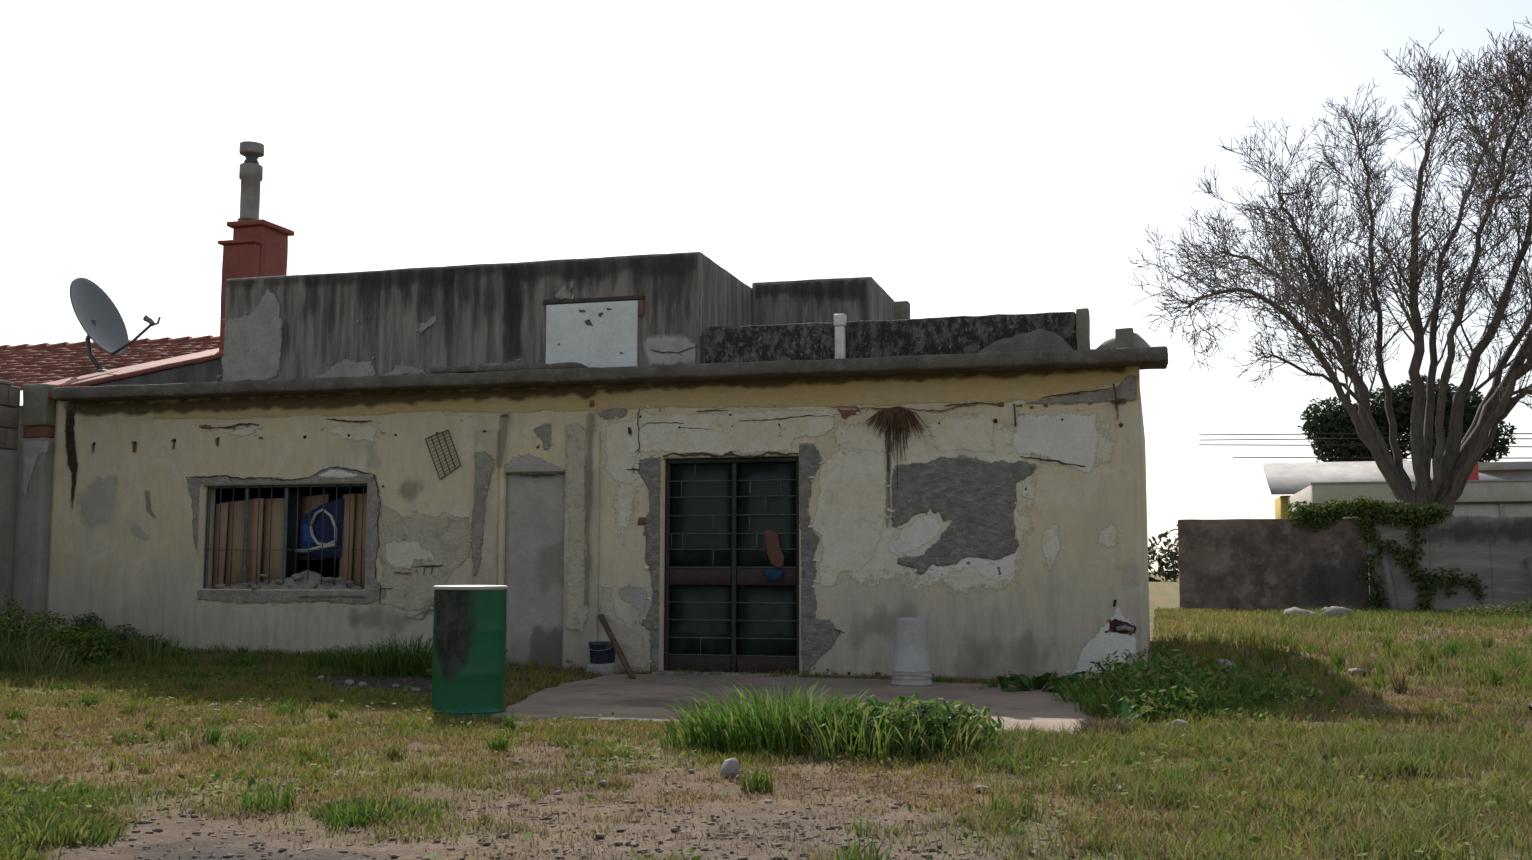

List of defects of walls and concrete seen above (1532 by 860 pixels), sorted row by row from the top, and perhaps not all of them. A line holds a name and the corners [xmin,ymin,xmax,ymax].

water stain [225,254,697,360]
water stain [23,335,1126,502]
peeling [377,541,434,582]
spalling [469,451,496,576]
spalling [533,374,1139,675]